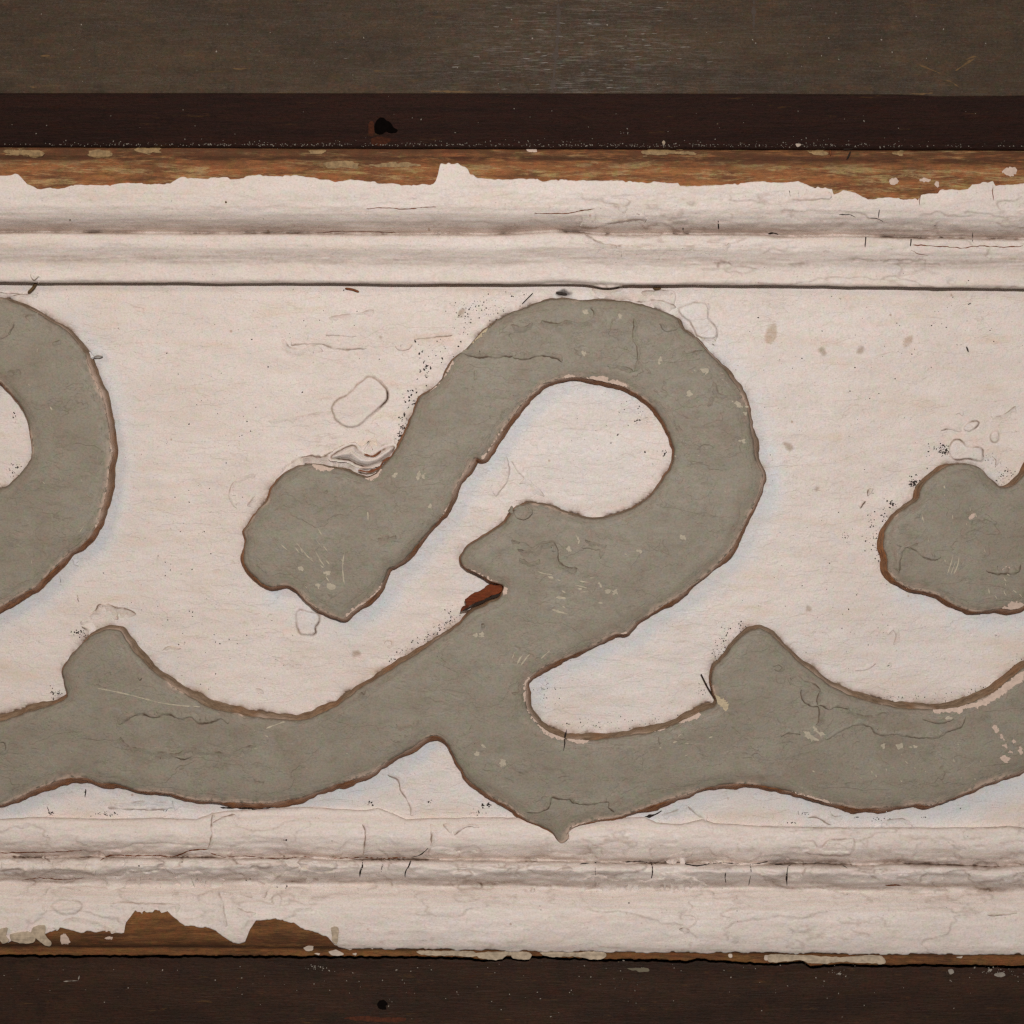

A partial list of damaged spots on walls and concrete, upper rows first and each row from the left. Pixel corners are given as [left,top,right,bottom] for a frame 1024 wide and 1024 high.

peeling [0,148,438,189]
peeling [467,141,1024,200]
crack [220,804,273,812]
crack [527,791,616,814]
crack [1,848,428,880]
crack [581,861,847,886]
peeling [0,910,232,947]
peeling [246,918,357,956]
peeling [540,951,606,960]